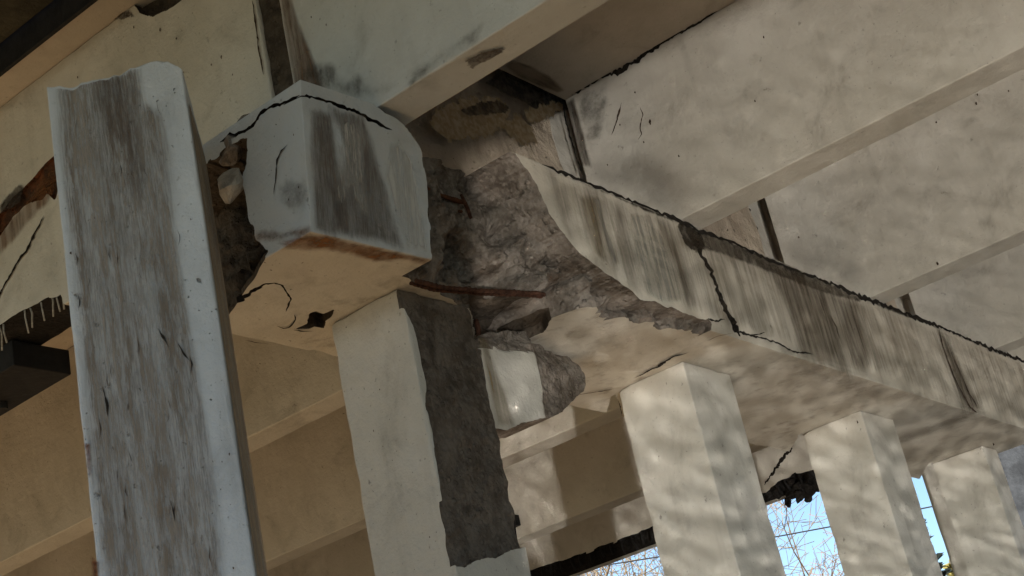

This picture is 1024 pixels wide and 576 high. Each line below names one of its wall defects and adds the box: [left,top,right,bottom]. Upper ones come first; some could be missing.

crack [220,94,392,142]
crack [562,11,717,175]
rust [0,186,23,247]
peeling [217,168,244,204]
crack [0,218,43,295]
leakage [189,107,268,576]
crack [236,283,308,344]
spalling [396,100,712,568]
crack [698,247,811,354]
crack [764,448,792,485]
spalling [761,470,819,508]
spalling [530,526,656,576]